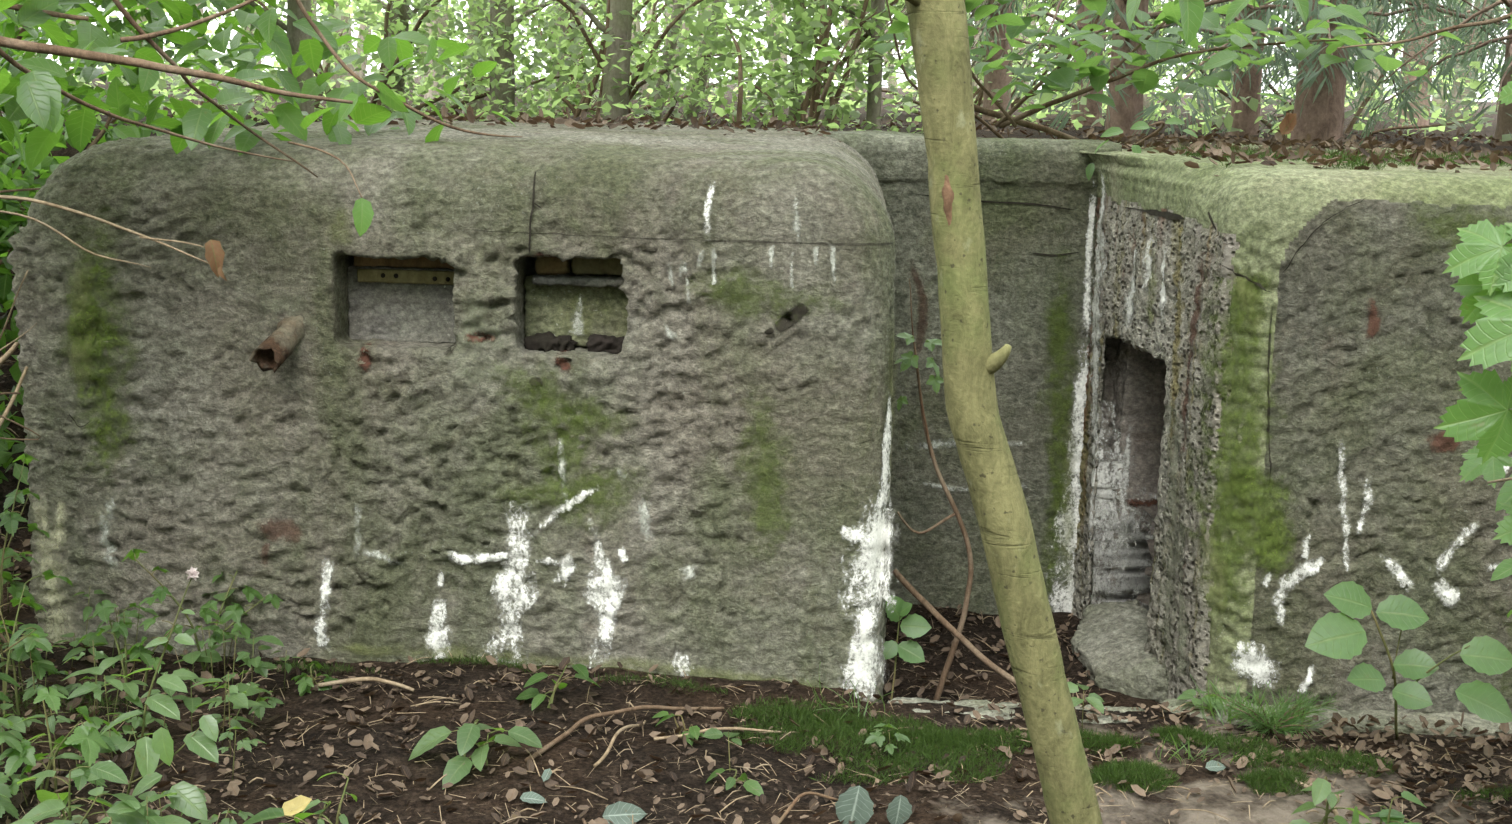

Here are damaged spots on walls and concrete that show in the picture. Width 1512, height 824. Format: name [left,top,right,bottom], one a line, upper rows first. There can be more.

leakage [314,561,333,646]
leakage [425,443,628,668]
leakage [841,397,896,699]
leakage [1264,534,1323,623]
leakage [1338,444,1373,569]
leakage [1386,558,1412,587]
leakage [1435,524,1475,605]
leakage [672,653,690,676]
leakage [1232,641,1277,686]
leakage [1298,667,1313,692]